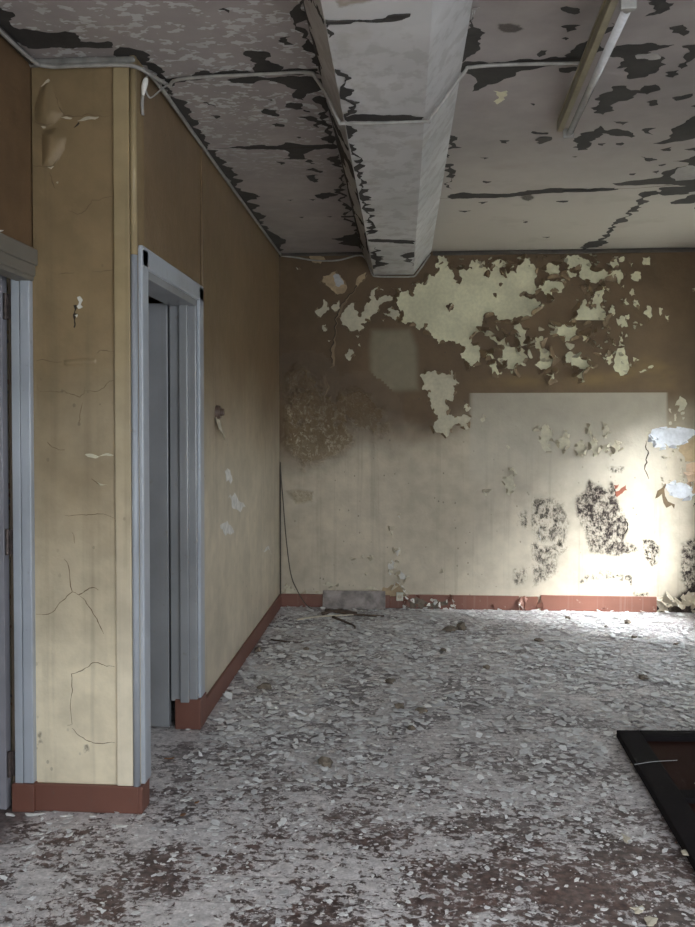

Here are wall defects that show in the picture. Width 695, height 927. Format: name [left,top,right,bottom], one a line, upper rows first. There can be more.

peeling [648,396,695,508]
crack [42,513,113,634]
mould [515,500,565,583]
mould [576,467,659,565]
leakage [660,539,695,613]
crack [70,662,114,744]
peeling [0,514,695,927]